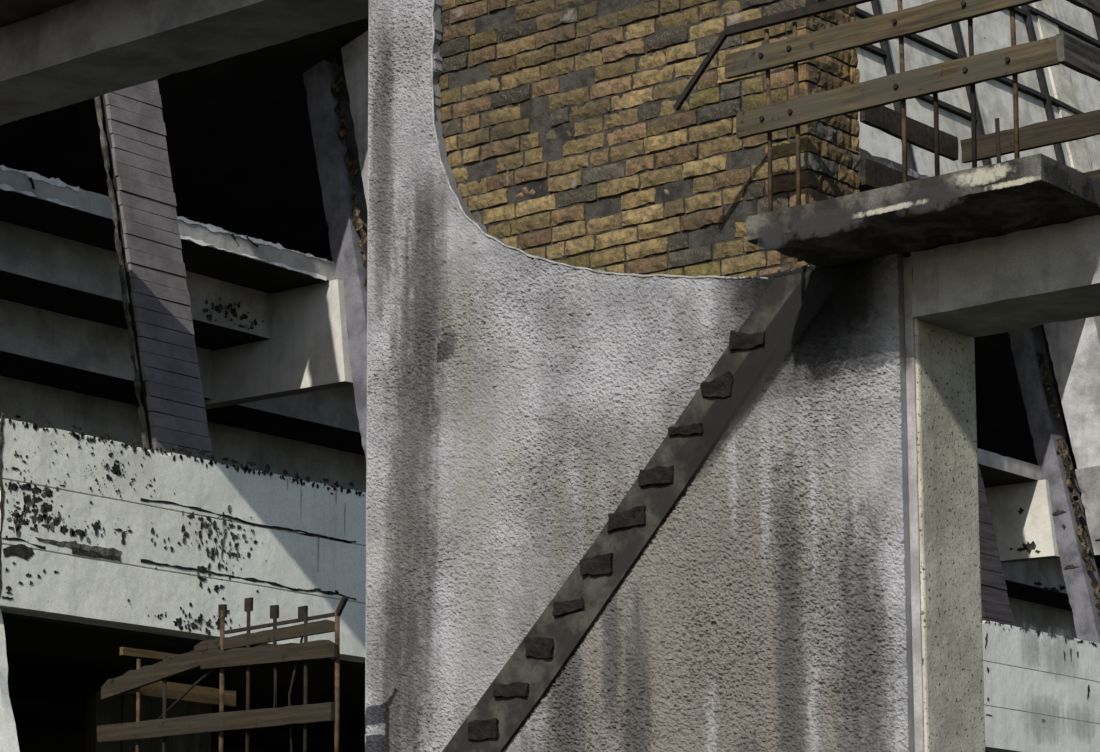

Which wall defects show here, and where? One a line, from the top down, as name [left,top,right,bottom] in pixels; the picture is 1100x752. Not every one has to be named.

peeling [1,414,364,572]
crack [141,498,356,543]
spalling [1009,541,1041,554]
spalling [1052,436,1100,618]
spalling [2,569,59,600]
peeling [146,505,263,640]
crack [141,559,356,600]
spalling [985,621,1097,649]